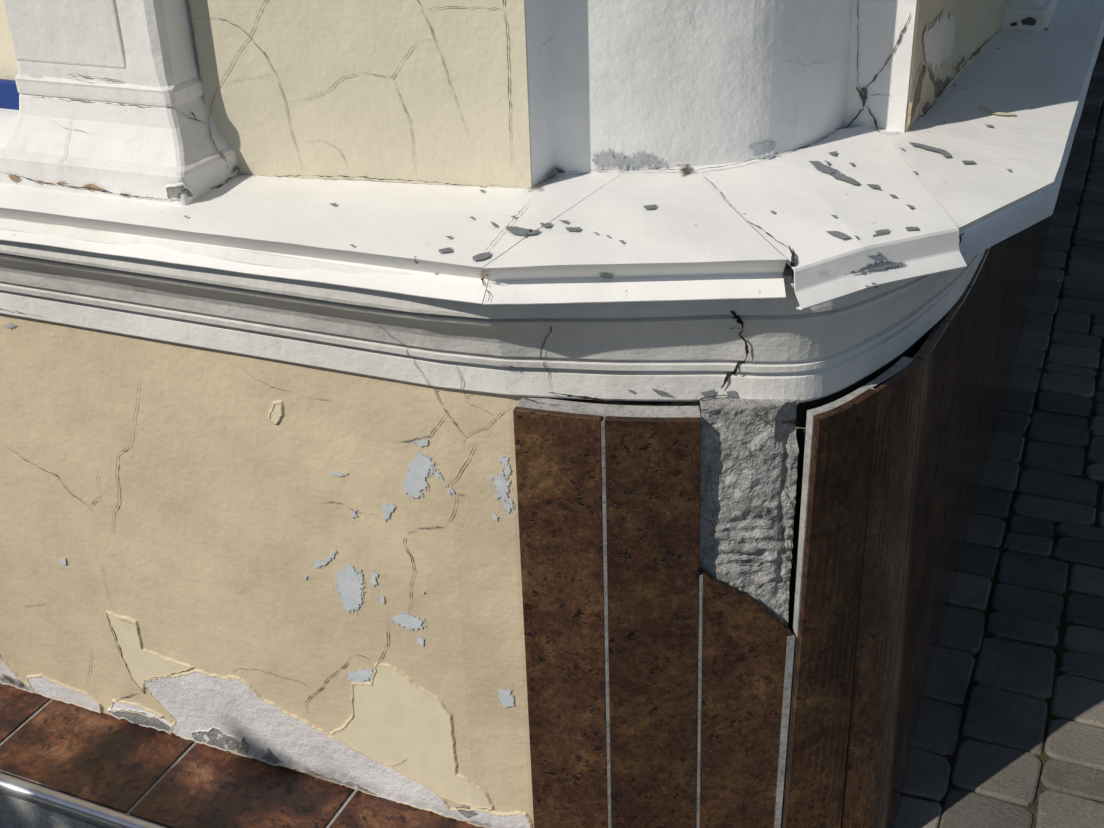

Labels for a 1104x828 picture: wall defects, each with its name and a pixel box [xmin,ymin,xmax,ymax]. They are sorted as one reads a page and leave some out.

crack [7,0,512,200]
crack [784,0,911,133]
flaking render [906,11,981,128]
peeling [590,149,669,172]
peeling [809,151,915,208]
peeling [900,142,976,163]
peeling [491,215,581,238]
peeling [825,231,858,239]
peeling [845,252,905,289]
crack [228,310,750,711]
peeling [302,550,385,615]
flaking render [0,610,533,828]